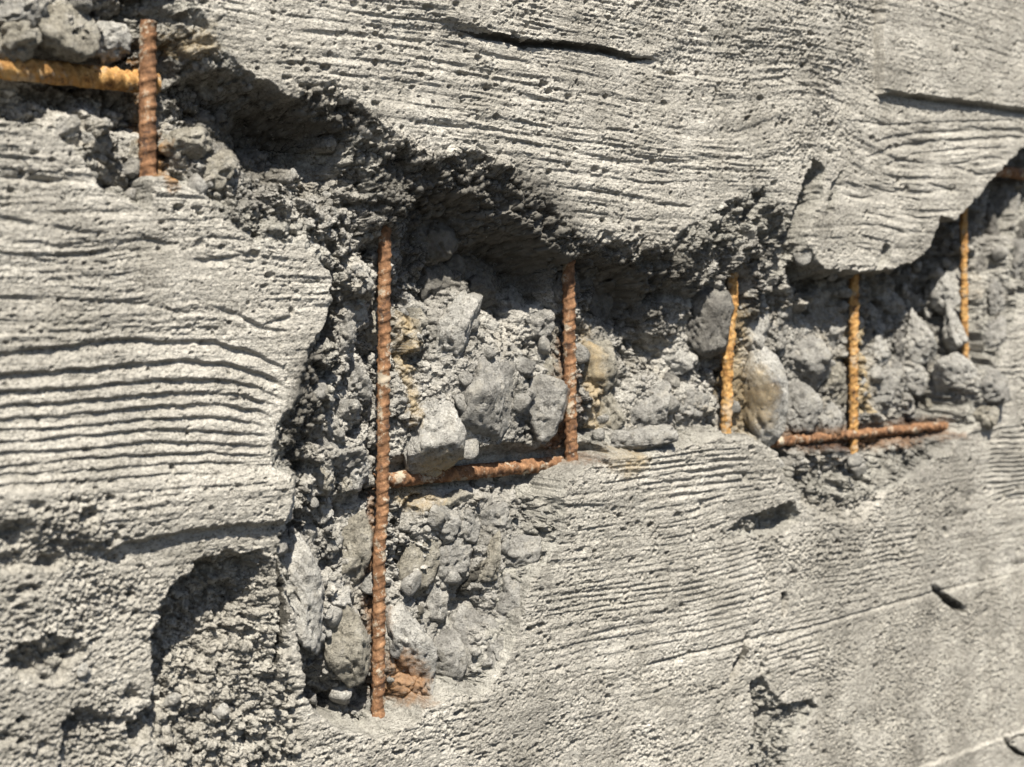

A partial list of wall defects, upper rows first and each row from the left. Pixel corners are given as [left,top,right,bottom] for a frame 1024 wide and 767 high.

spalling [1004,148,1024,168]
spalling [0,0,570,715]
rust [546,415,565,455]
spalling [311,157,1024,740]
rust [786,421,947,447]